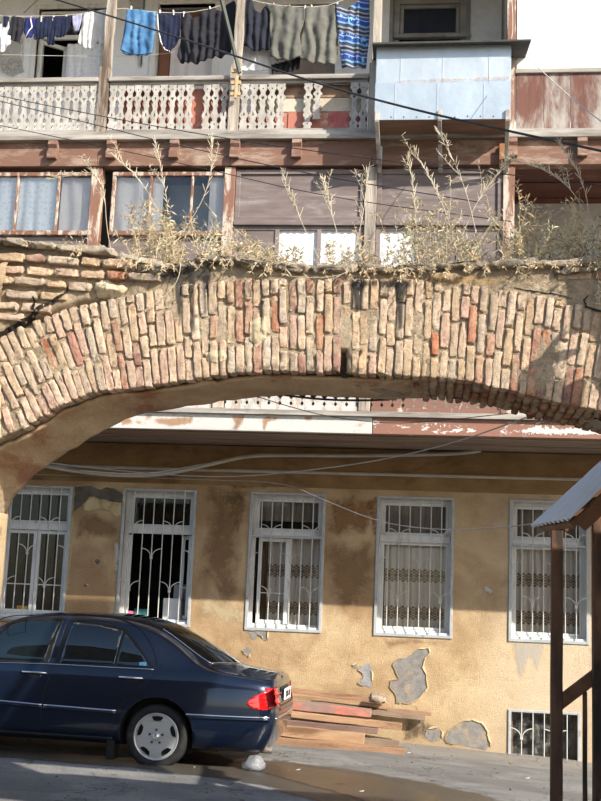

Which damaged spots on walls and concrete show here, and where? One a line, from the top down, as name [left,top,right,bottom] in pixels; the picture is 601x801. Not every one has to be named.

crack [0,286,68,338]
damp [146,259,219,329]
damp [352,267,410,328]
damp [431,267,492,284]
peeling [522,425,601,436]
flaking render [66,484,123,591]
flaking render [351,663,374,688]
flaking render [389,647,431,705]
flaking render [424,718,491,751]